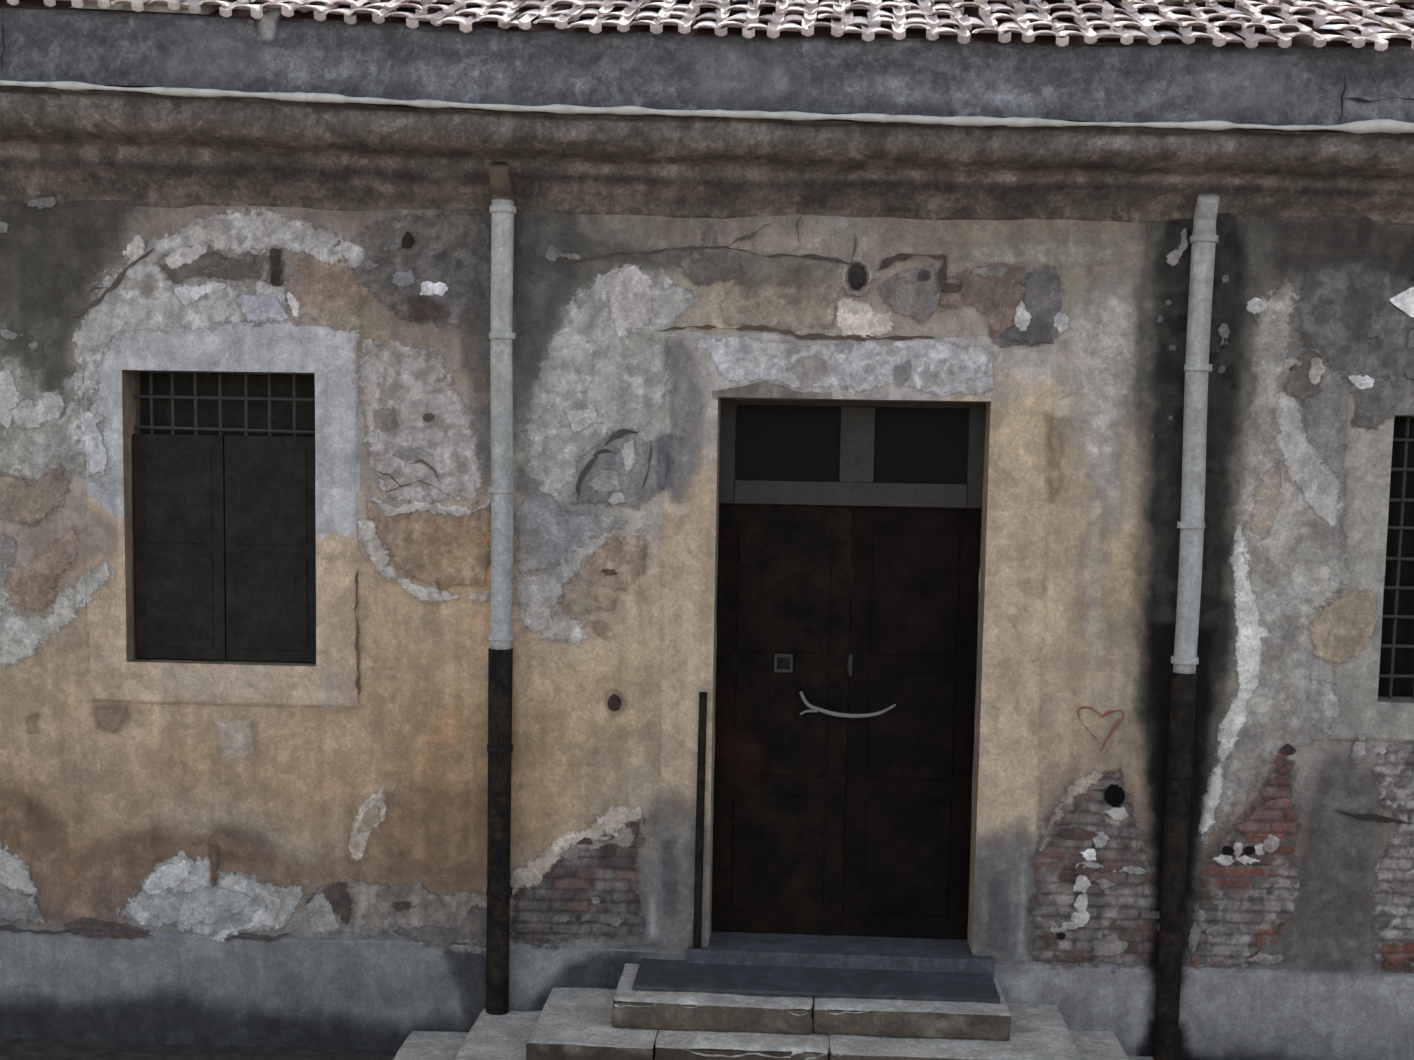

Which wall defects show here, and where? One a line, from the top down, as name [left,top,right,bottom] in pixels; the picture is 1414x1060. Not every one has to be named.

peeling [0,206,491,603]
peeling [513,221,835,647]
crack [540,214,859,265]
peeling [694,241,1140,669]
leakage [1134,218,1194,1057]
leakage [1183,213,1414,933]
peeling [1184,254,1414,977]
crack [1339,68,1414,123]
leakage [0,942,486,1052]
peeling [116,844,487,955]
spalling [1026,769,1159,974]
leakage [1177,1027,1281,1060]